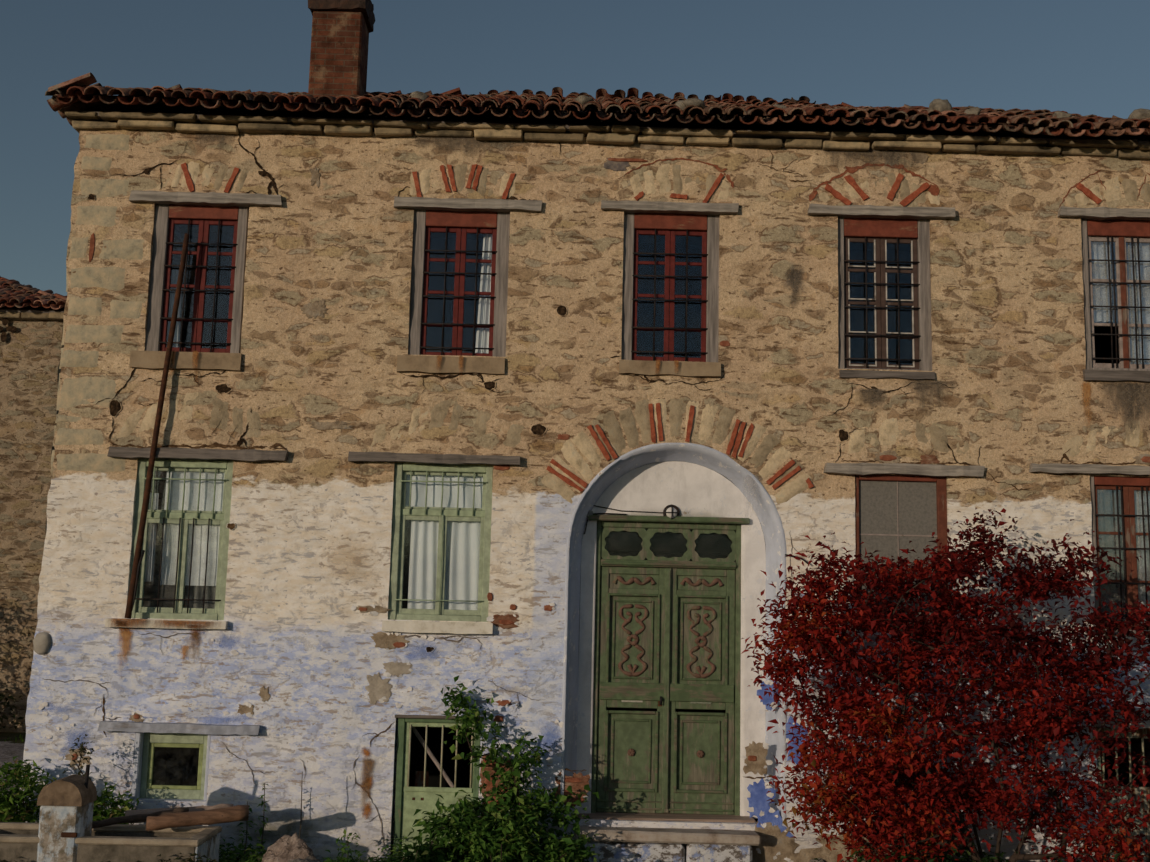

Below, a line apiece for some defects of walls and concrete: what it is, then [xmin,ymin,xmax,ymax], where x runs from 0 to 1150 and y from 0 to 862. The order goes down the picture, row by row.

crack [111,141,187,189]
crack [238,130,288,195]
crack [96,351,287,450]
spalling [351,604,391,616]
corrosion [111,618,213,658]
spalling [365,631,440,705]
spalling [106,712,171,722]
spalling [185,686,270,724]
peeling [786,716,813,765]
corrosion [361,749,374,818]
spalling [741,741,975,862]